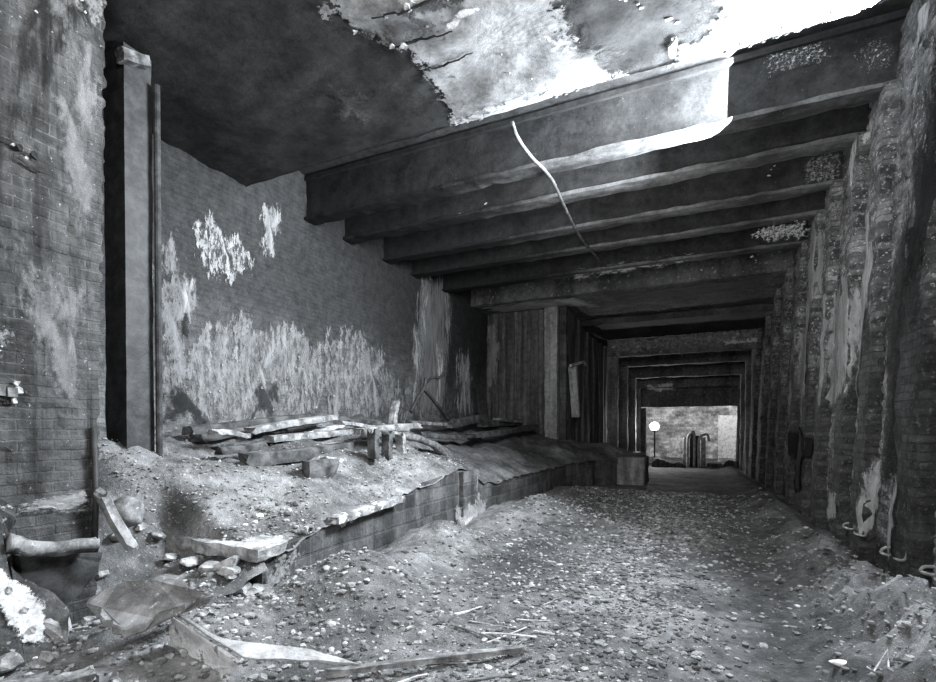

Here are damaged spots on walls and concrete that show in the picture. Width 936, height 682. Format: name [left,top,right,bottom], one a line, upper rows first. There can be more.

damp [11,0,48,116]
damp [42,4,81,88]
peeling [317,0,628,126]
damp [915,0,931,58]
peeling [192,203,281,285]
peeling [152,229,412,422]
damp [855,150,936,558]
spalling [0,568,46,646]